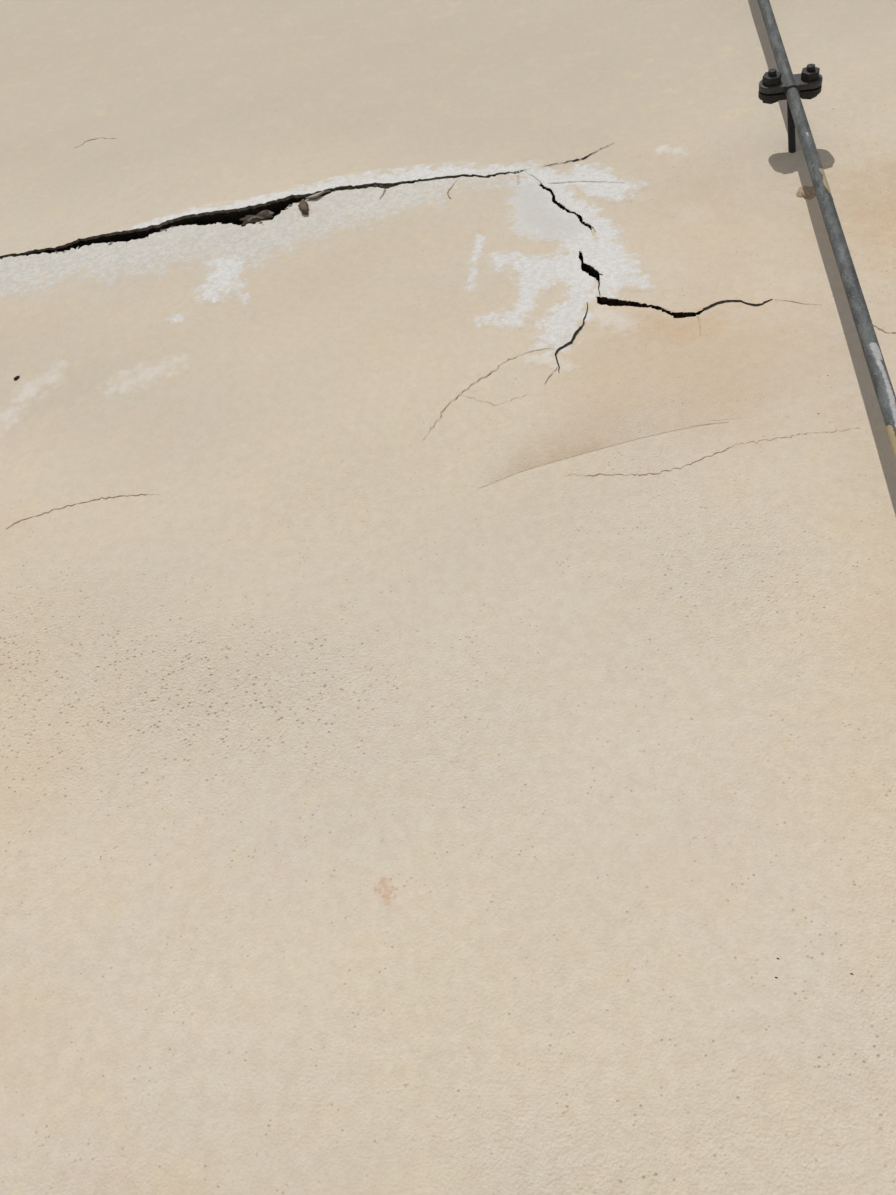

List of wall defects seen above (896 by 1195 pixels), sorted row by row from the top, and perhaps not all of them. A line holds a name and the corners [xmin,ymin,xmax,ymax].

crack [239,204,292,227]
peeling [0,159,661,373]
crack [320,145,821,440]
crack [6,494,159,529]